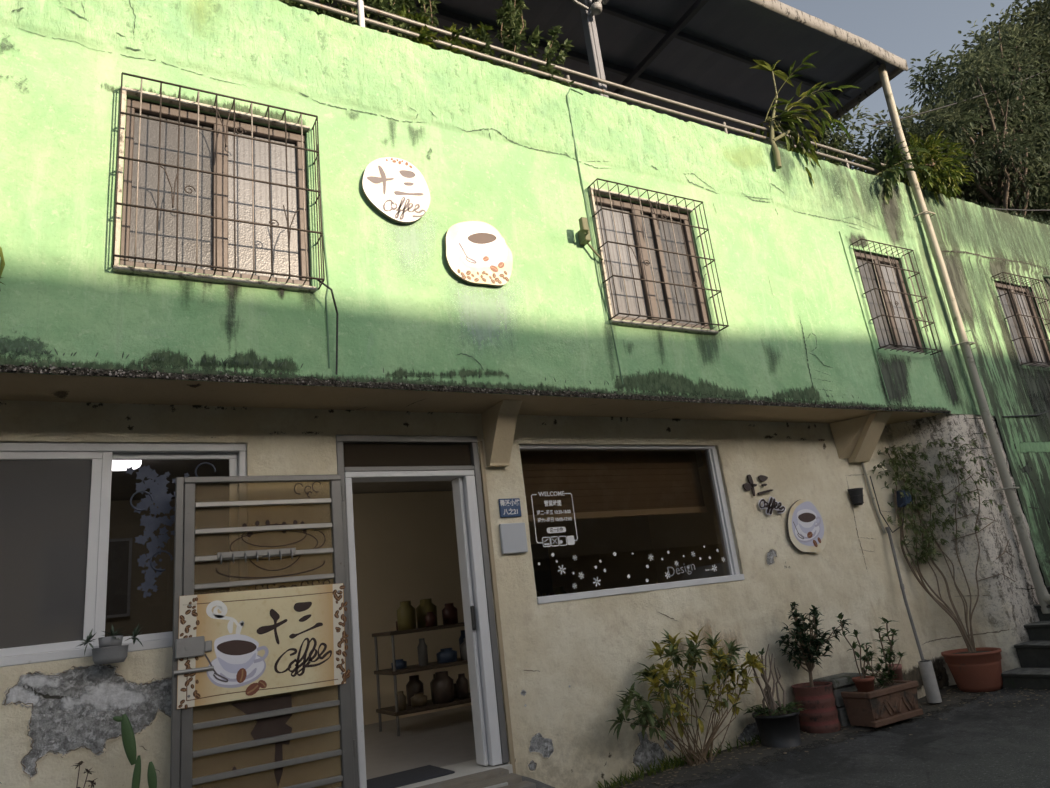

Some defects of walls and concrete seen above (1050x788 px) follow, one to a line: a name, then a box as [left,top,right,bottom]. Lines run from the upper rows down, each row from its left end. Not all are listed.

crack [299,92,435,123]
crack [457,127,610,168]
damp [858,177,904,246]
damp [911,252,932,321]
damp [0,332,53,360]
damp [698,334,720,361]
damp [932,207,1050,436]
damp [877,351,912,405]
peeling [0,663,172,782]
peeling [527,731,555,772]